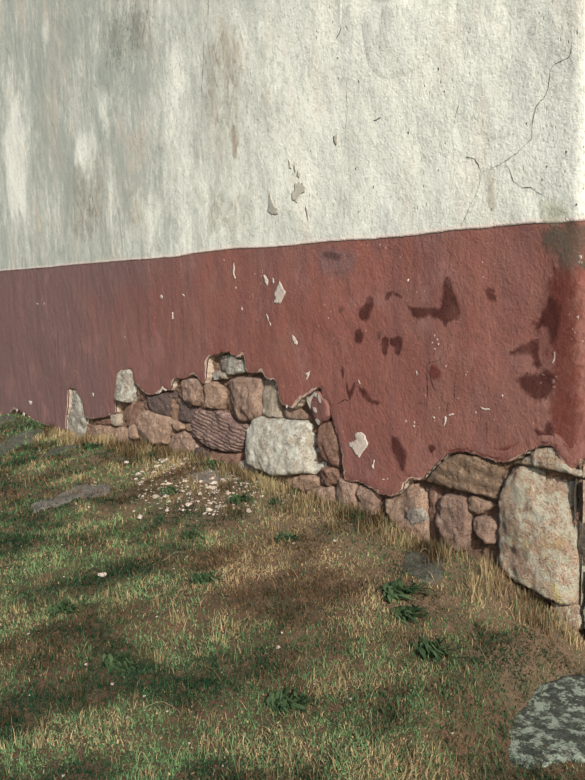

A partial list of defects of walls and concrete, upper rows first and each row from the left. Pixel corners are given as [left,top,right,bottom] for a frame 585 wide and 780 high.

crack [461,29,572,226]
peeling [267,189,279,215]
peeling [288,159,309,220]
peeling [254,273,285,304]
leakage [359,298,373,320]
leakage [409,277,460,326]
leakage [382,336,402,355]
leakage [511,269,581,446]
spalling [54,351,551,518]
leakage [392,437,406,470]
spalling [539,458,585,525]
spalling [464,535,500,565]